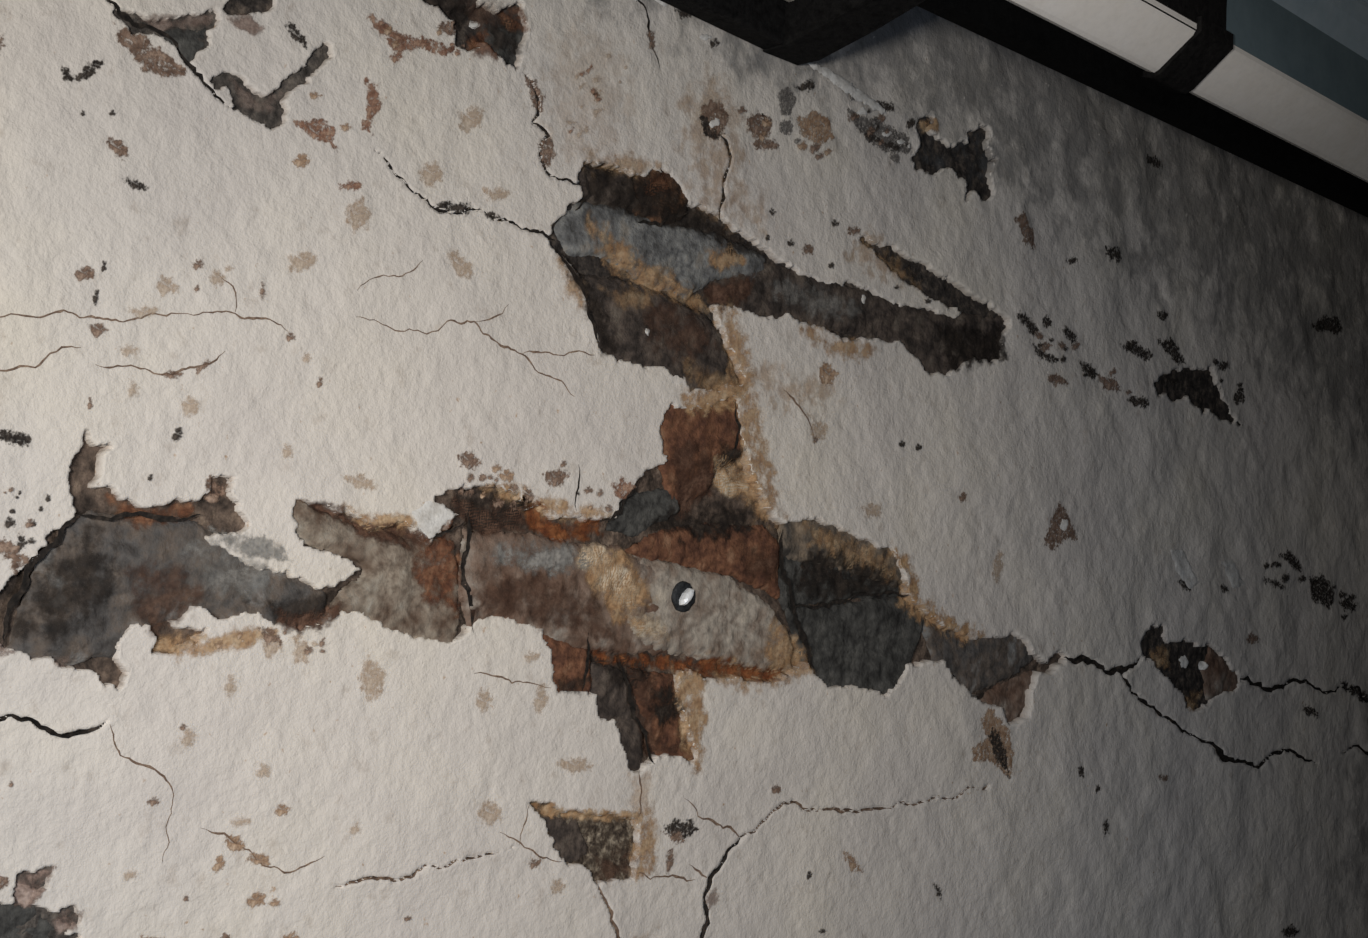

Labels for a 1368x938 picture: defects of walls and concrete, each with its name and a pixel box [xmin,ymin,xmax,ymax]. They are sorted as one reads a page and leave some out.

crack [107,0,225,105]
flaking render [112,0,273,77]
flaking render [369,0,543,112]
corrosion [682,303,788,520]
corrosion [348,506,413,534]
corrosion [482,484,604,520]
flaking render [0,162,1245,779]
crack [1064,655,1368,769]
flaking render [0,866,82,938]
crack [0,714,174,862]
flaking render [530,801,638,881]
crack [639,786,987,938]